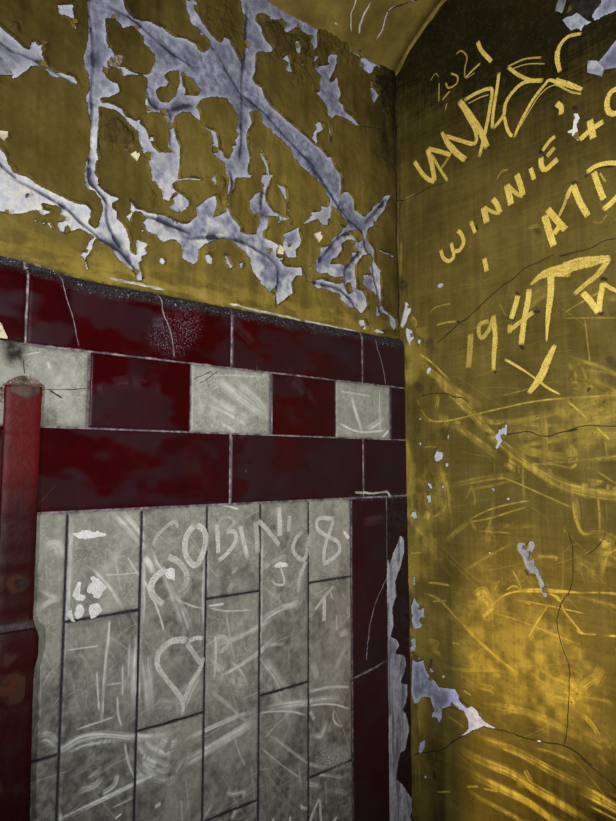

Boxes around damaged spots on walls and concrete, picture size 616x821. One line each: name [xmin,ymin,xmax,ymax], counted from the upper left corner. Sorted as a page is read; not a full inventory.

peeling [555,0,616,31]
peeling [587,41,616,77]
peeling [568,113,580,141]
peeling [0,0,421,344]
crack [439,238,616,342]
crack [506,425,616,437]
peeling [517,541,549,597]
peeling [387,536,495,821]
crack [498,532,616,787]